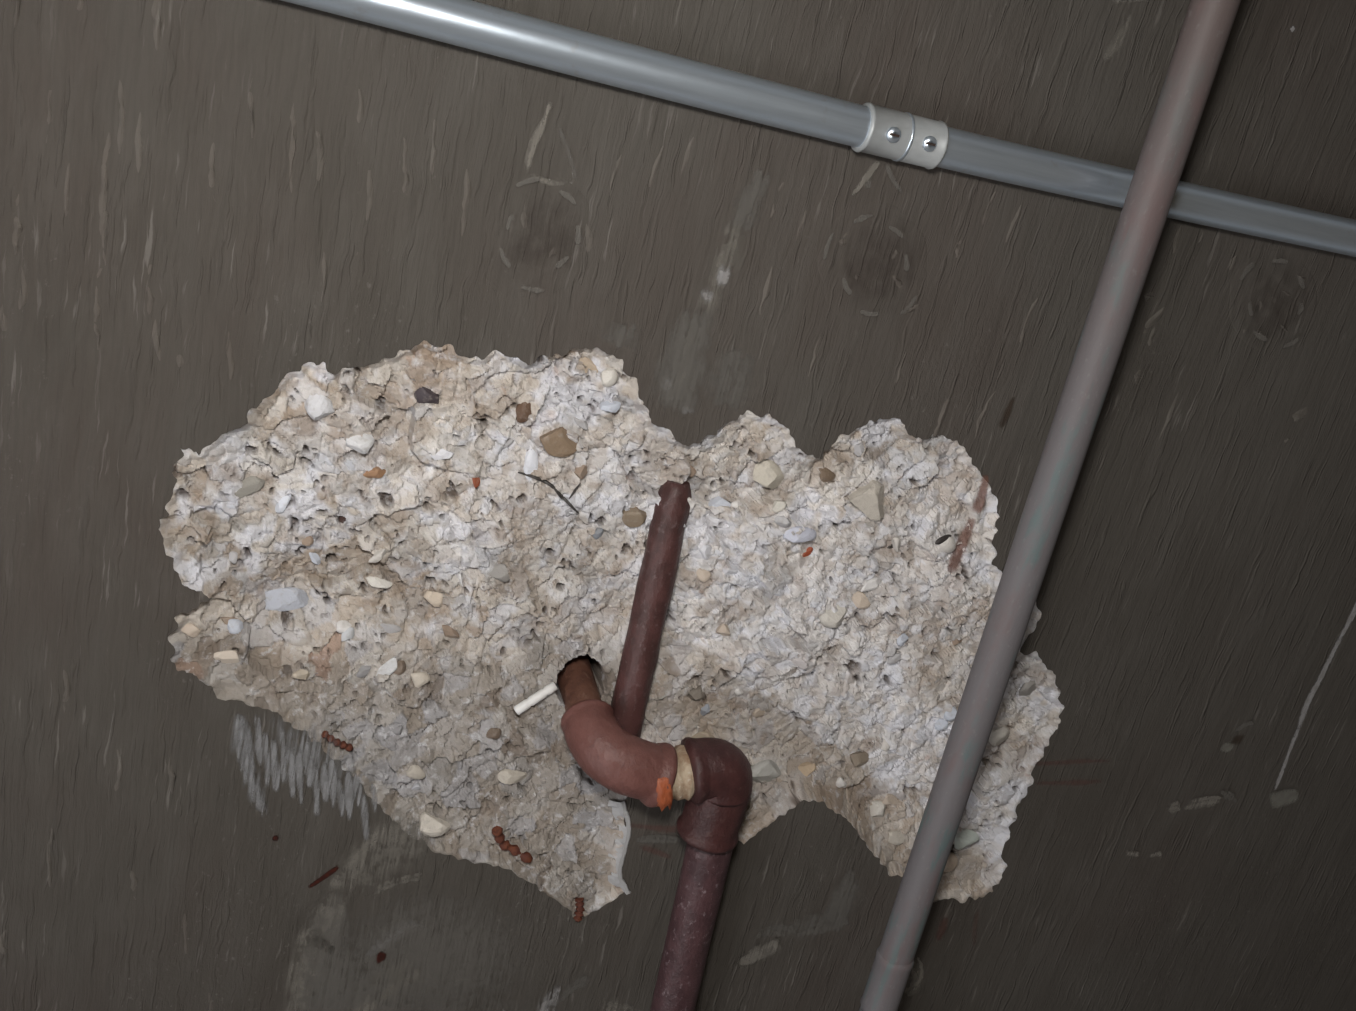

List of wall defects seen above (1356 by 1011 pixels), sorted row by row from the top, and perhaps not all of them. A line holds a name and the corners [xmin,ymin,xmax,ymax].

peeling [94,80,143,350]
spalling [159,332,1002,918]
spalling [933,603,1065,903]